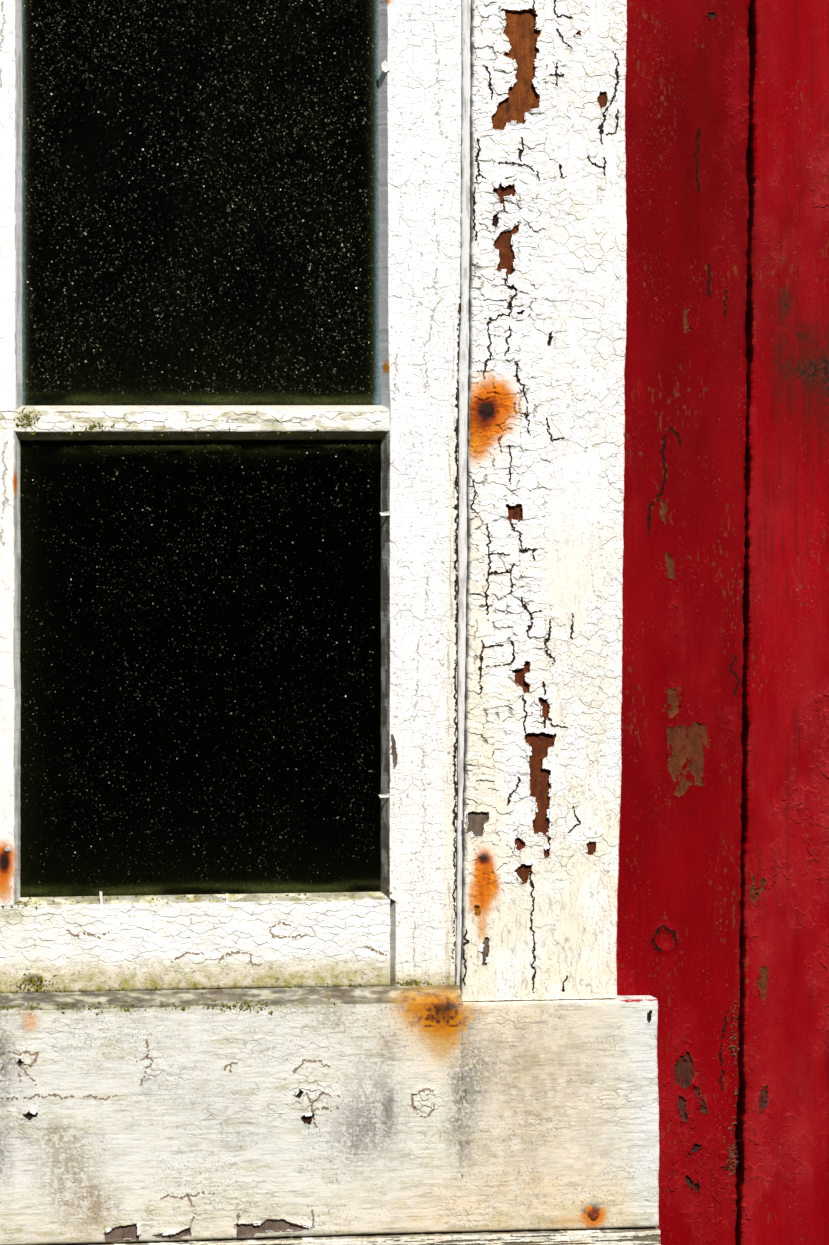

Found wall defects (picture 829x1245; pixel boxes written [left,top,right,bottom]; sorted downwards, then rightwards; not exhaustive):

crack [432,12,540,241]
peeling [491,8,542,130]
crack [532,0,573,86]
crack [587,51,620,176]
peeling [492,179,520,296]
corrosion [469,378,516,455]
peeling [503,502,523,524]
crack [363,208,574,993]
peeling [507,661,556,884]
corrosion [0,844,14,894]
corrosion [473,852,498,914]
corrosion [402,996,469,1046]